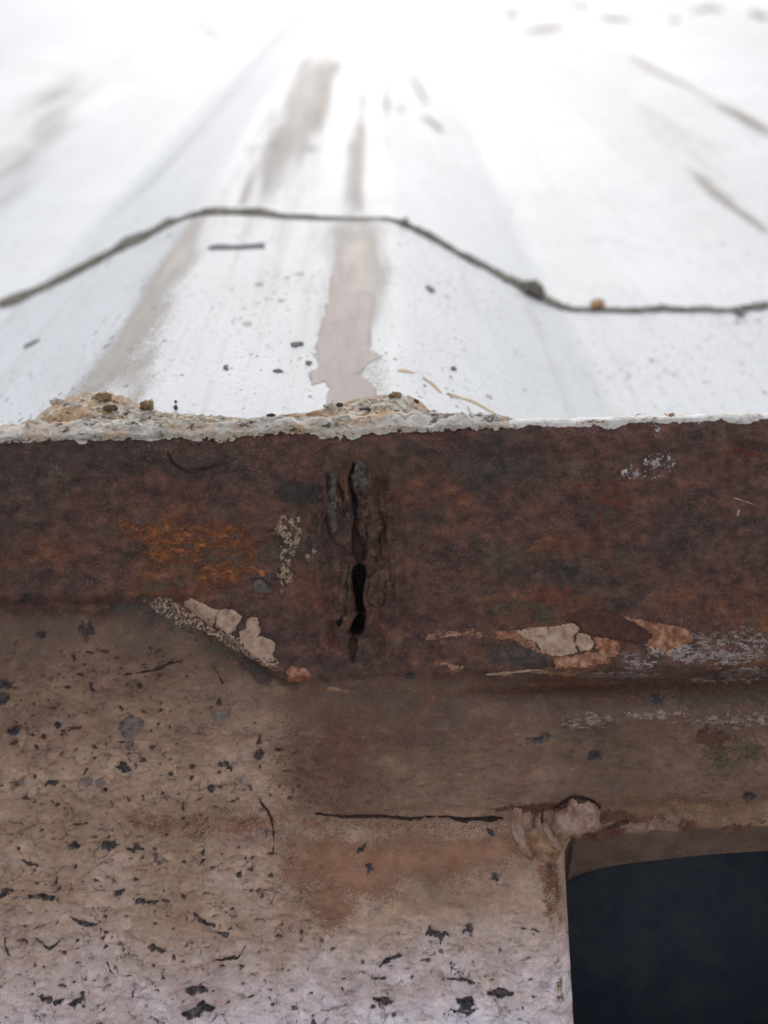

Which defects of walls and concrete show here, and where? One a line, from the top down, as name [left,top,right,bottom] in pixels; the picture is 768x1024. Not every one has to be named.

leakage [63,52,345,407]
leakage [307,91,398,405]
rust [114,480,266,591]
crack [317,459,395,660]
peeling [143,596,311,682]
rust [406,628,487,673]
peeling [495,616,768,734]
crack [315,812,503,823]